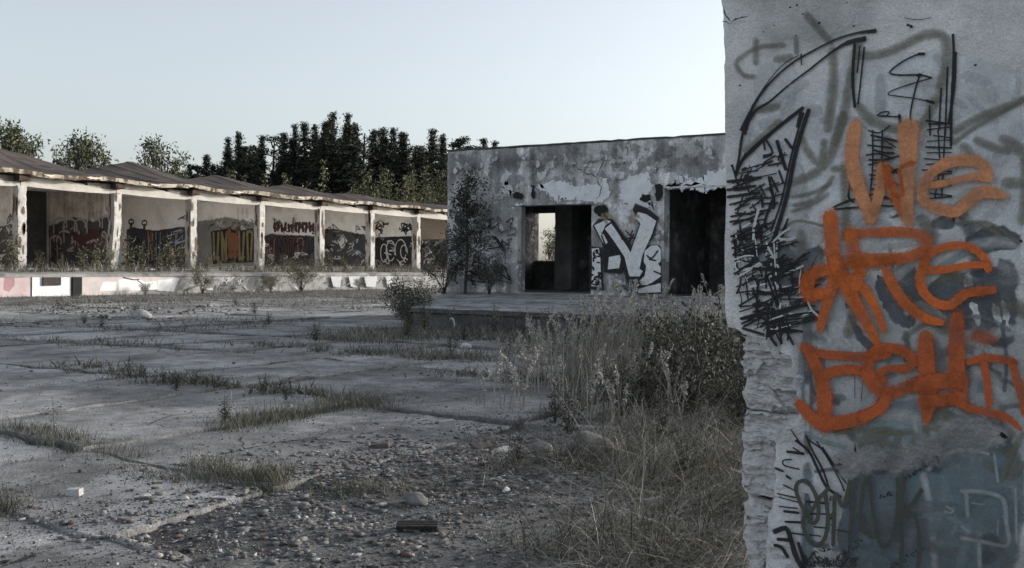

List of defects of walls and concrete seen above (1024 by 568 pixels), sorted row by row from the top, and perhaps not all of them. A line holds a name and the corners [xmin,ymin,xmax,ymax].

peeling [500,178,518,199]
peeling [521,144,656,211]
peeling [666,164,733,194]
crack [213,430,339,457]
spalling [740,330,805,568]